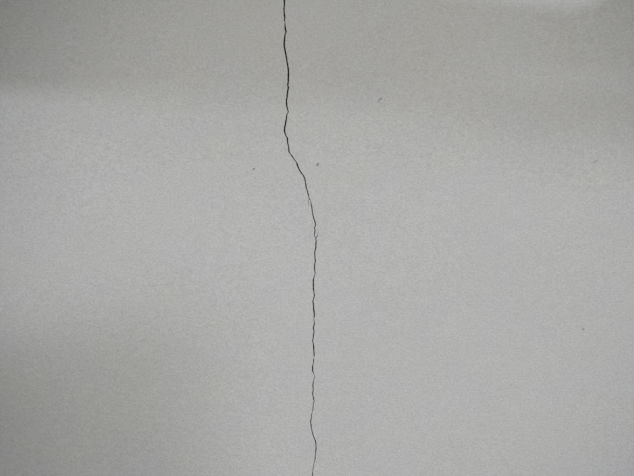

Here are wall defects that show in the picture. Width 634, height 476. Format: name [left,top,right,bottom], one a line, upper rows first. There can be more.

crack [283,0,318,476]